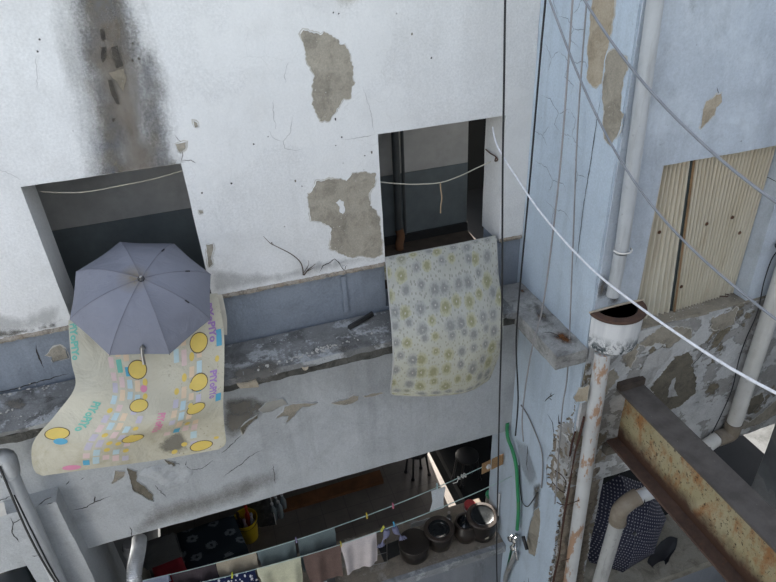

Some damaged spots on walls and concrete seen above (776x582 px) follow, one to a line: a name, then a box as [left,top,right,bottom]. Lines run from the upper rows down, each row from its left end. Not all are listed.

water stain [78,0,174,175]
peeling [298,28,356,123]
peeling [586,0,628,147]
peeling [699,92,723,130]
peeling [307,171,384,259]
crack [536,98,601,260]
peeling [240,397,318,435]
peeling [605,326,698,410]
peeling [742,392,776,430]
peeling [110,467,155,502]
spalling [546,378,606,582]
peeling [527,506,541,557]